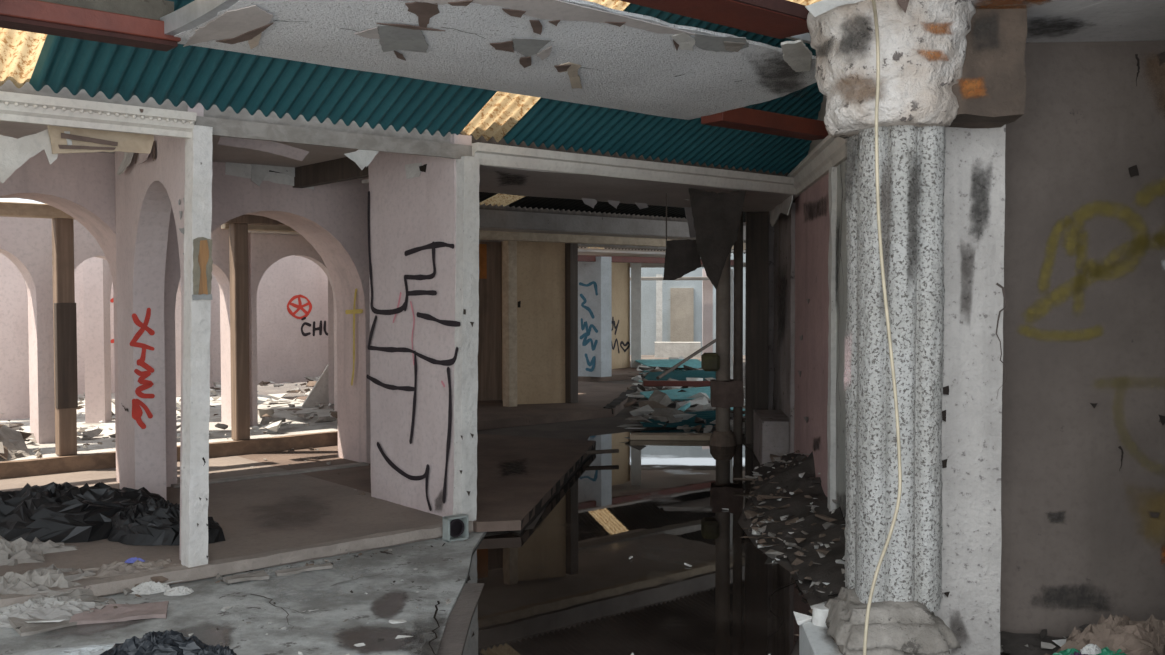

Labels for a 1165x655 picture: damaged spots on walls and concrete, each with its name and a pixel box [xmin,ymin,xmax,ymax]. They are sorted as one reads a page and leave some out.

flaking render [354,0,749,89]
flaking render [781,39,812,72]
flaking render [805,0,865,17]
leakage [817,17,870,57]
leakage [1027,19,1082,37]
leakage [837,79,876,99]
flaking render [0,129,72,183]
leakage [971,171,990,236]
leakage [962,253,974,311]
leakage [335,592,443,655]